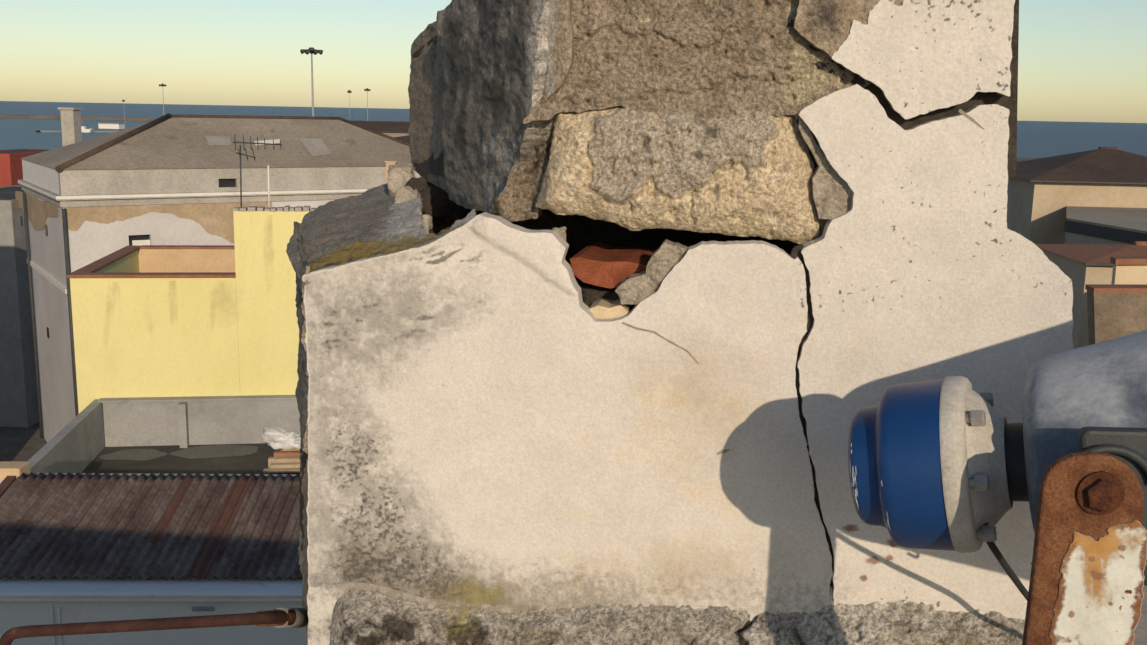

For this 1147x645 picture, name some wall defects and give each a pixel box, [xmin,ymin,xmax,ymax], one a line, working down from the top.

crack [787,19,1010,130]
peeling [15,191,272,244]
spalling [483,0,903,318]
crack [791,245,834,587]
corrosion [186,473,254,579]
damp [328,430,456,598]
crack [734,615,758,645]
corrosion [1050,521,1147,645]